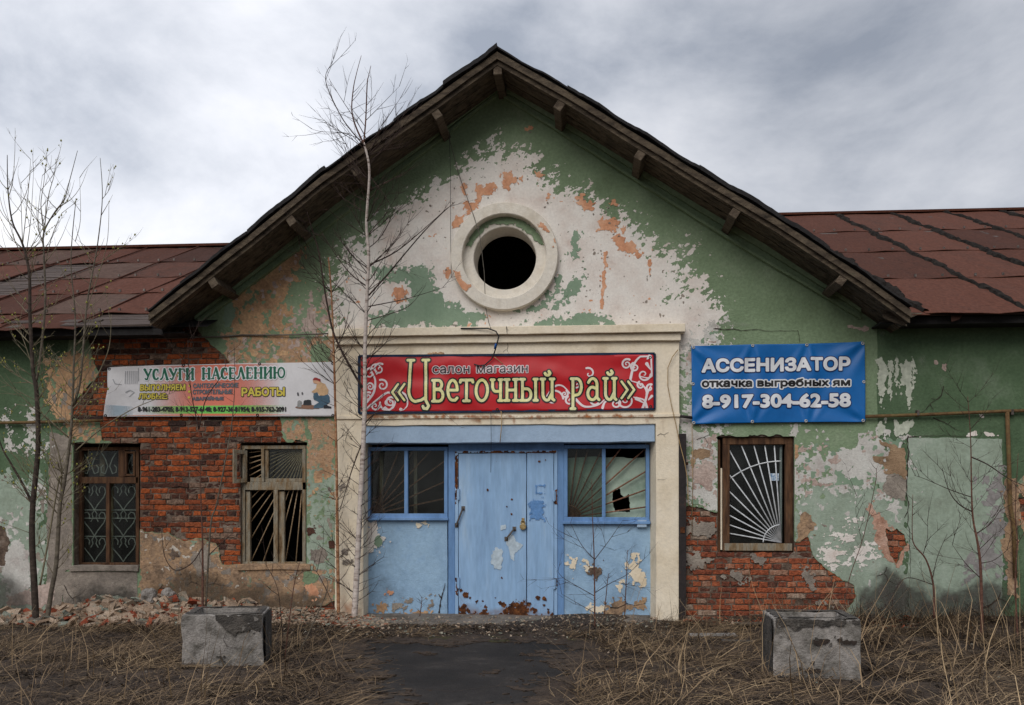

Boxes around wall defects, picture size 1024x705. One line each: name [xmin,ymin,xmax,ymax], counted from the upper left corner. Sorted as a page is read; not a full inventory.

peeling [215,125,738,524]
peeling [0,351,354,664]
corrosion [455,578,553,615]
peeling [564,554,604,581]
peeling [585,552,647,615]
peeling [761,422,1024,676]